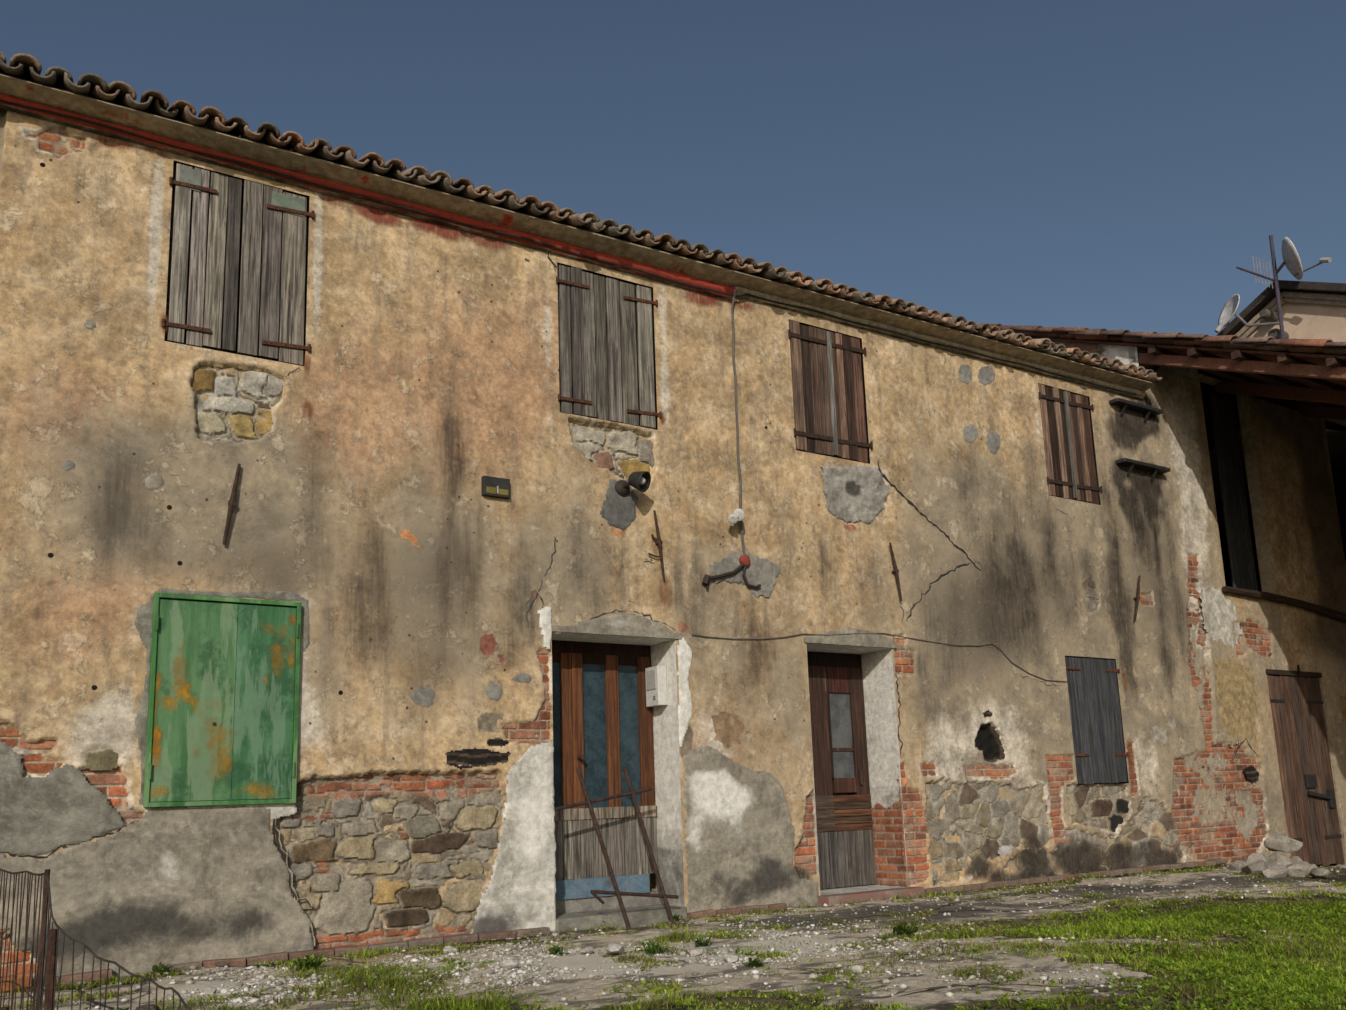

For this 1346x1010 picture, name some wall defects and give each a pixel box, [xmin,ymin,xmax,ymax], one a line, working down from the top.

crack [526,536,558,627]
crack [878,460,982,622]
leakage [1109,526,1126,649]
flaking render [0,722,62,776]
spalling [964,710,1016,779]
flaking render [1165,556,1272,866]
flaking render [81,767,143,825]
flaking render [273,650,551,949]
flaking render [795,791,817,875]
flaking render [868,763,936,886]
flaking render [1045,755,1074,846]
flaking render [0,932,37,976]